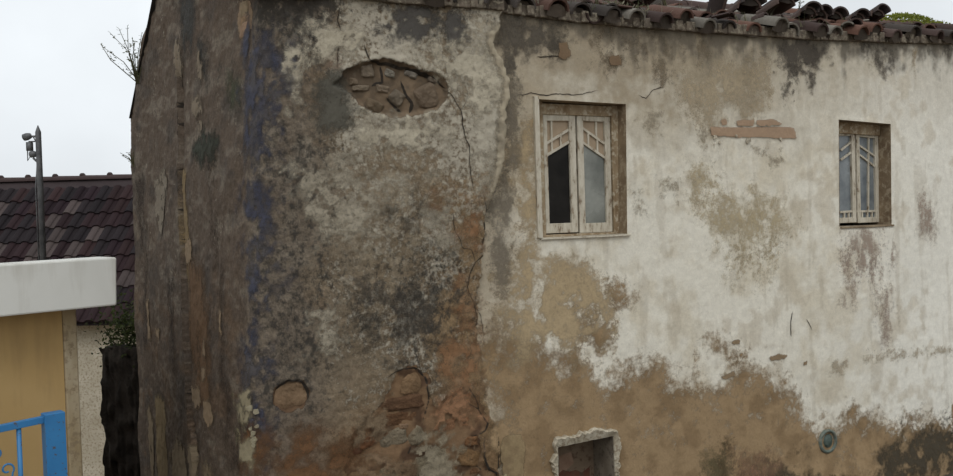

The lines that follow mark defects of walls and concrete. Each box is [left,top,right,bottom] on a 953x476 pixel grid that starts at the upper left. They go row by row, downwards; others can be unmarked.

water stain [374,5,471,47]
spalling [341,58,448,118]
peeling [710,119,796,144]
water stain [231,12,332,474]
crack [442,89,487,342]
water stain [470,14,953,476]
peeling [237,389,259,469]
spalling [273,379,310,413]
spalling [344,365,526,476]